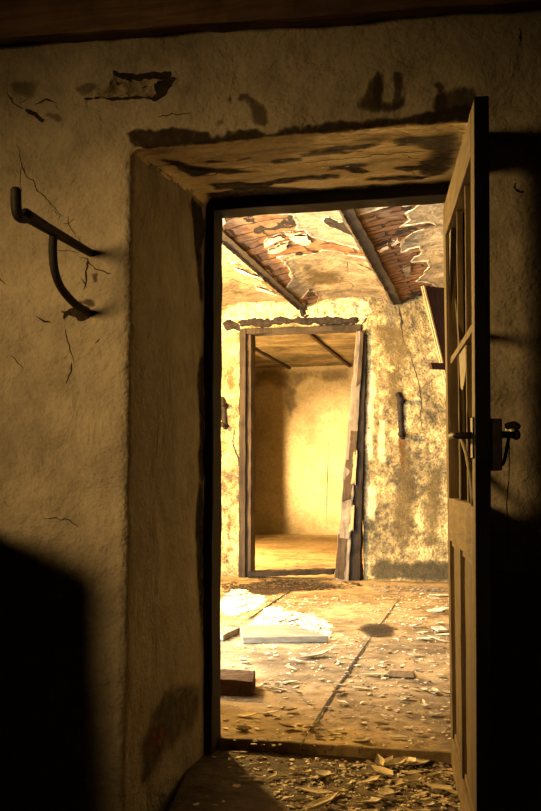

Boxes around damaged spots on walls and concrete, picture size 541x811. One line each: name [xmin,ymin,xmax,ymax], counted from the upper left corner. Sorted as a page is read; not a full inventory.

crack [7,93,58,109]
spalling [83,70,178,104]
damp [128,72,474,149]
crack [18,148,111,288]
spalling [222,214,374,332]
damp [150,134,459,301]
spalling [357,205,437,302]
damp [359,623,396,637]
damp [143,687,198,781]